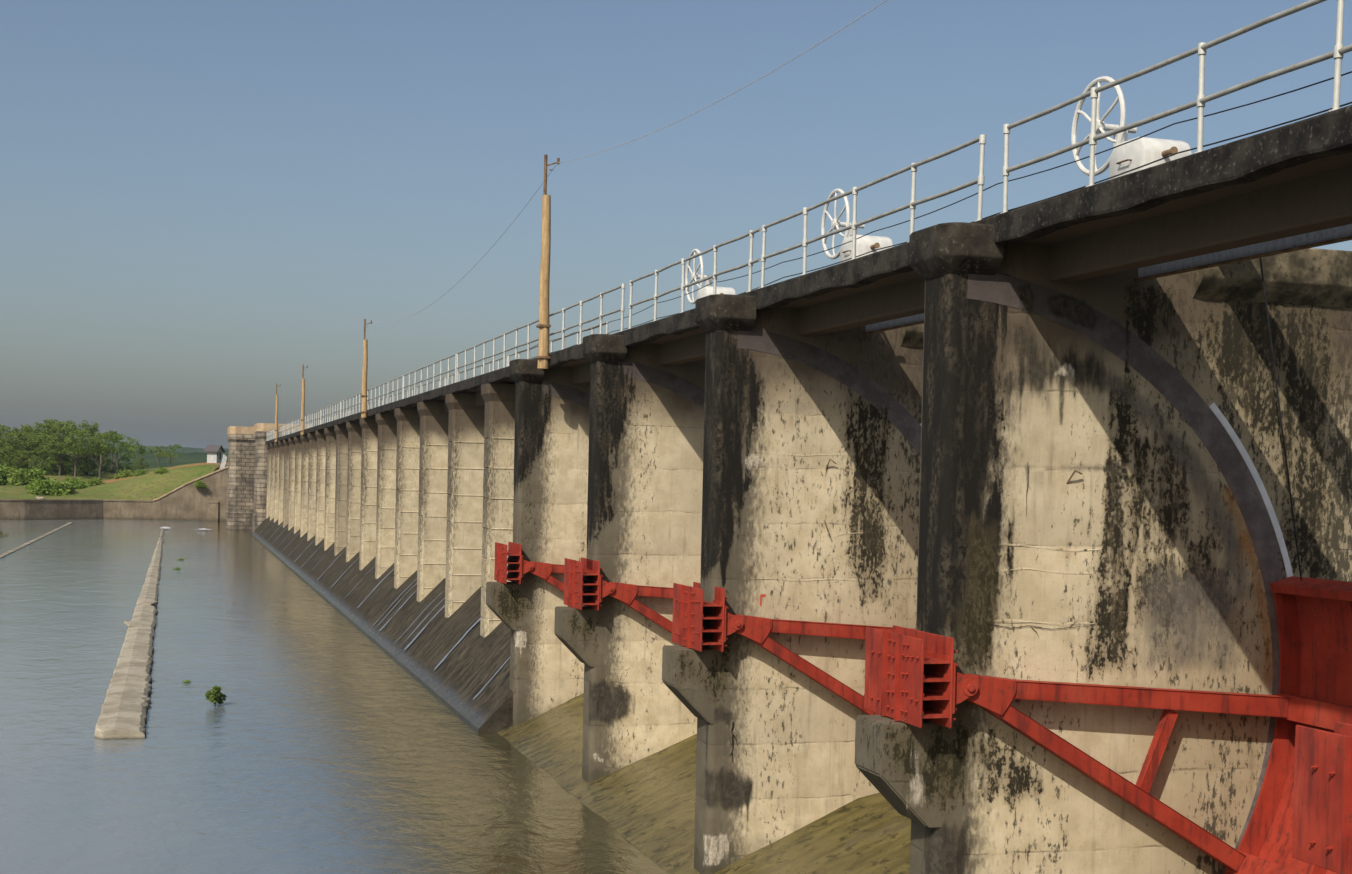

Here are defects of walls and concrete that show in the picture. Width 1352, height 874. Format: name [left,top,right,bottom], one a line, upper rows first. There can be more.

leakage [840,390,899,613]
leakage [1001,285,1350,681]